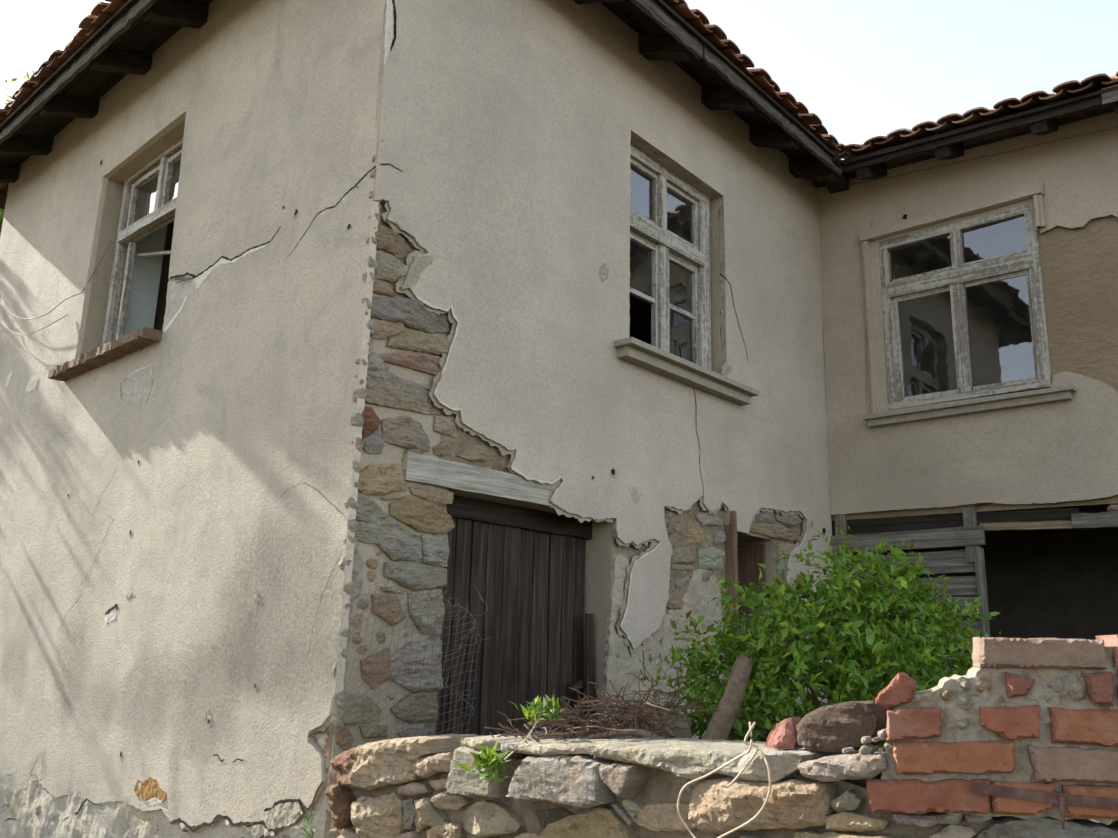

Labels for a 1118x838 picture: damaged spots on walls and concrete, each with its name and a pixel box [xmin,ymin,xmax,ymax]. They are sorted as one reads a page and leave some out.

crack [170,163,404,290]
spalling [321,155,613,773]
crack [693,388,704,496]
spalling [749,508,806,597]
flaking render [601,497,727,739]
crack [6,756,101,833]
spalling [134,777,167,803]
crack [170,782,323,838]